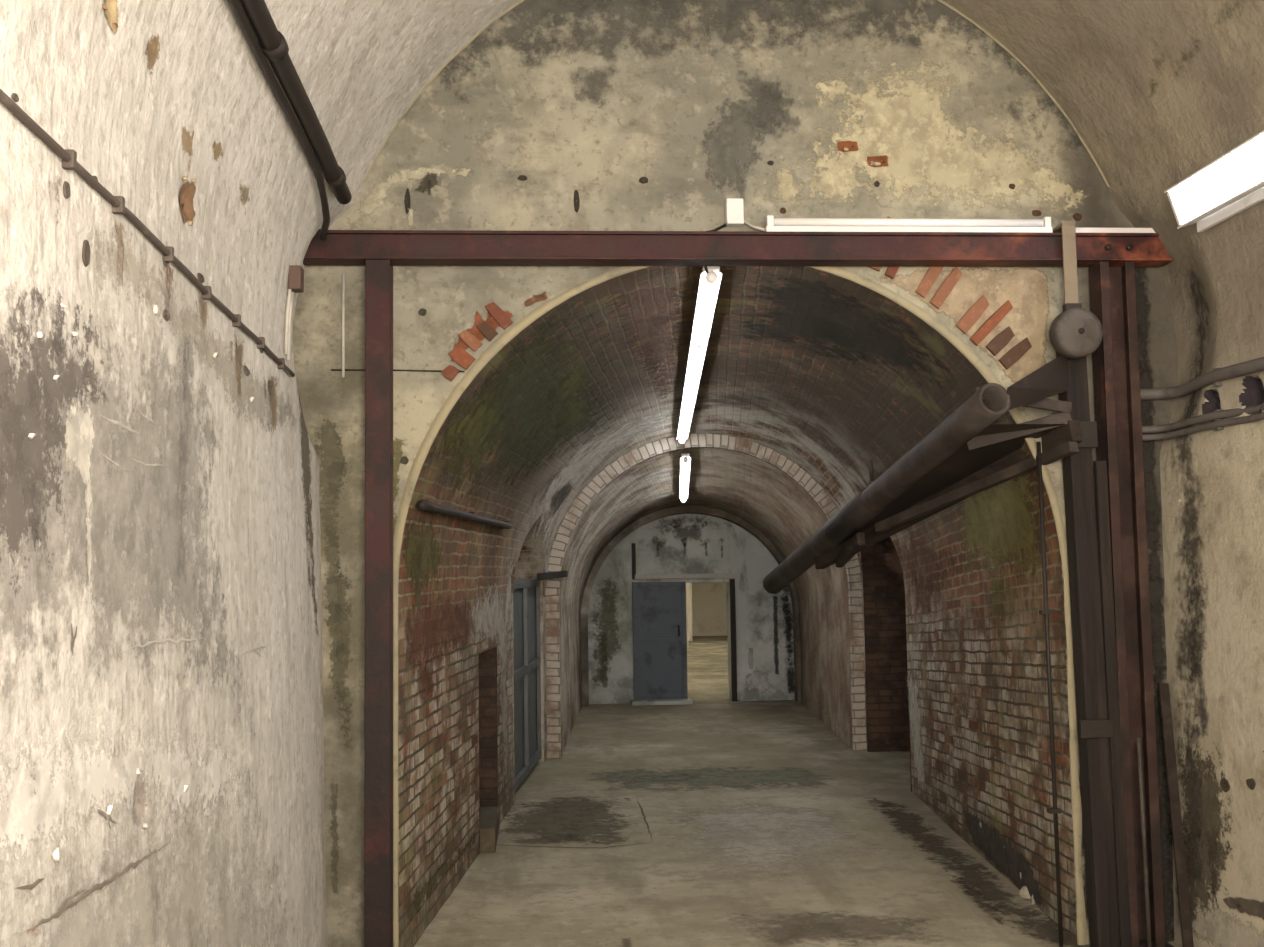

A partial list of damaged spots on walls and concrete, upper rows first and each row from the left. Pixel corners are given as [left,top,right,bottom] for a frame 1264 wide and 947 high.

flaking render [103,0,119,35]
water stain [703,75,799,200]
flaking render [763,61,1083,218]
flaking render [179,176,196,226]
flaking render [441,302,513,382]
flaking render [524,292,547,307]
flaking render [867,266,1049,382]
water stain [1192,581,1207,732]
water stain [501,767,825,844]
crack [17,842,170,947]